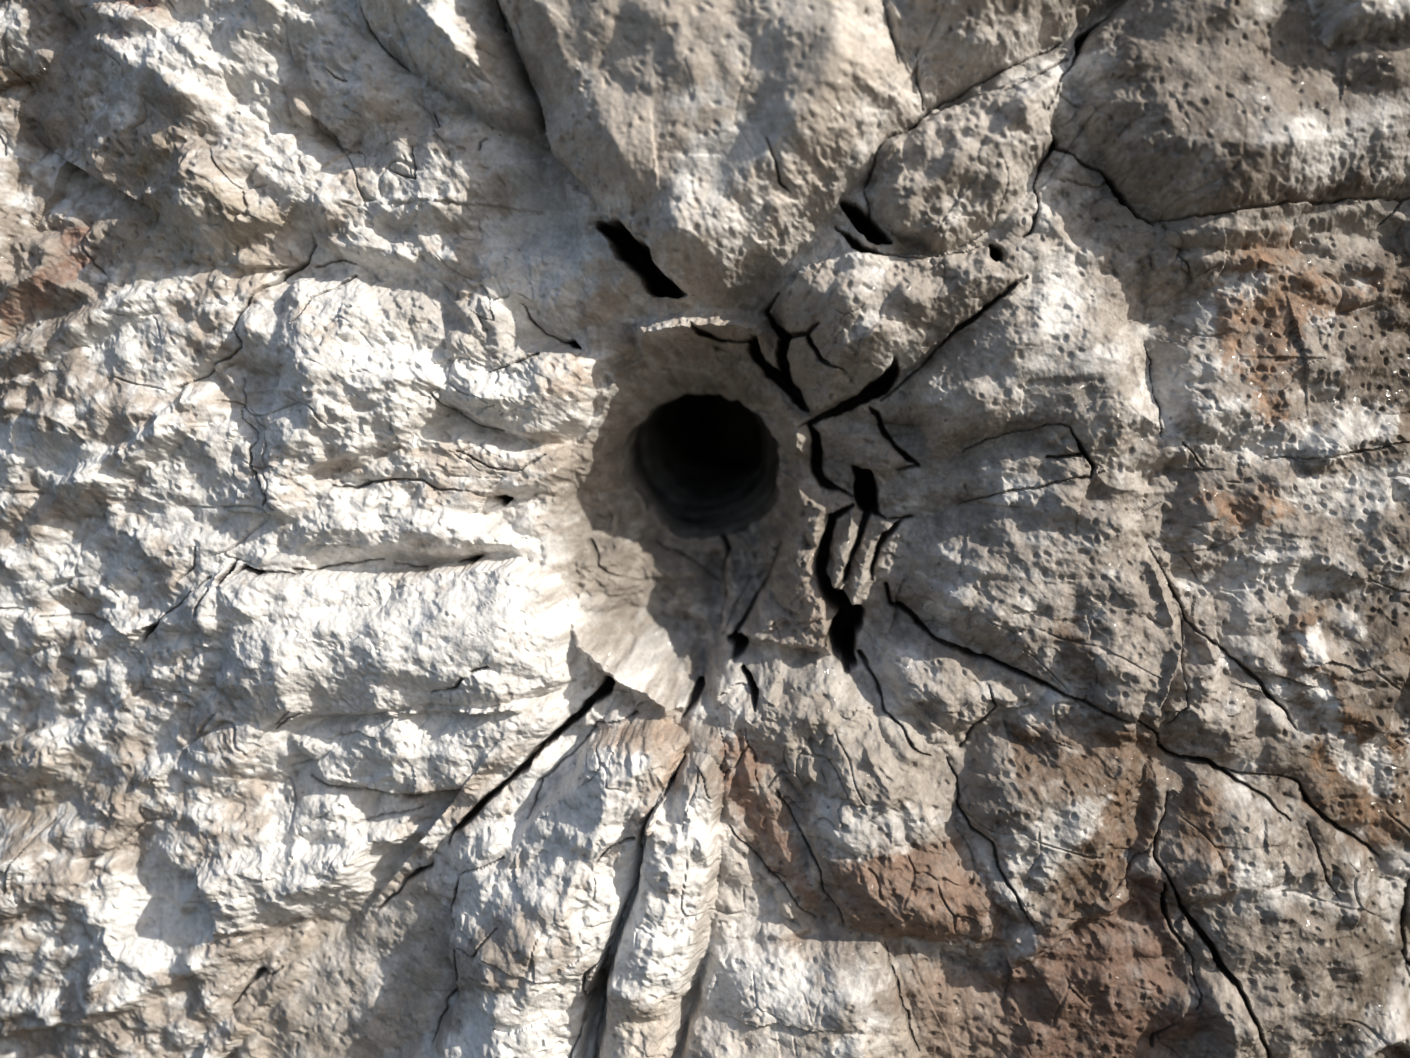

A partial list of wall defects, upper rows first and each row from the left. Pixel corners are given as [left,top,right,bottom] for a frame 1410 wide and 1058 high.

crack [177,230,359,512]
crack [488,305,582,373]
crack [331,393,546,507]
crack [588,0,1410,1058]
crack [0,547,484,644]
crack [275,713,302,731]
crack [432,666,490,694]
crack [311,675,639,1045]
crack [570,755,687,1058]
crack [231,965,284,1009]